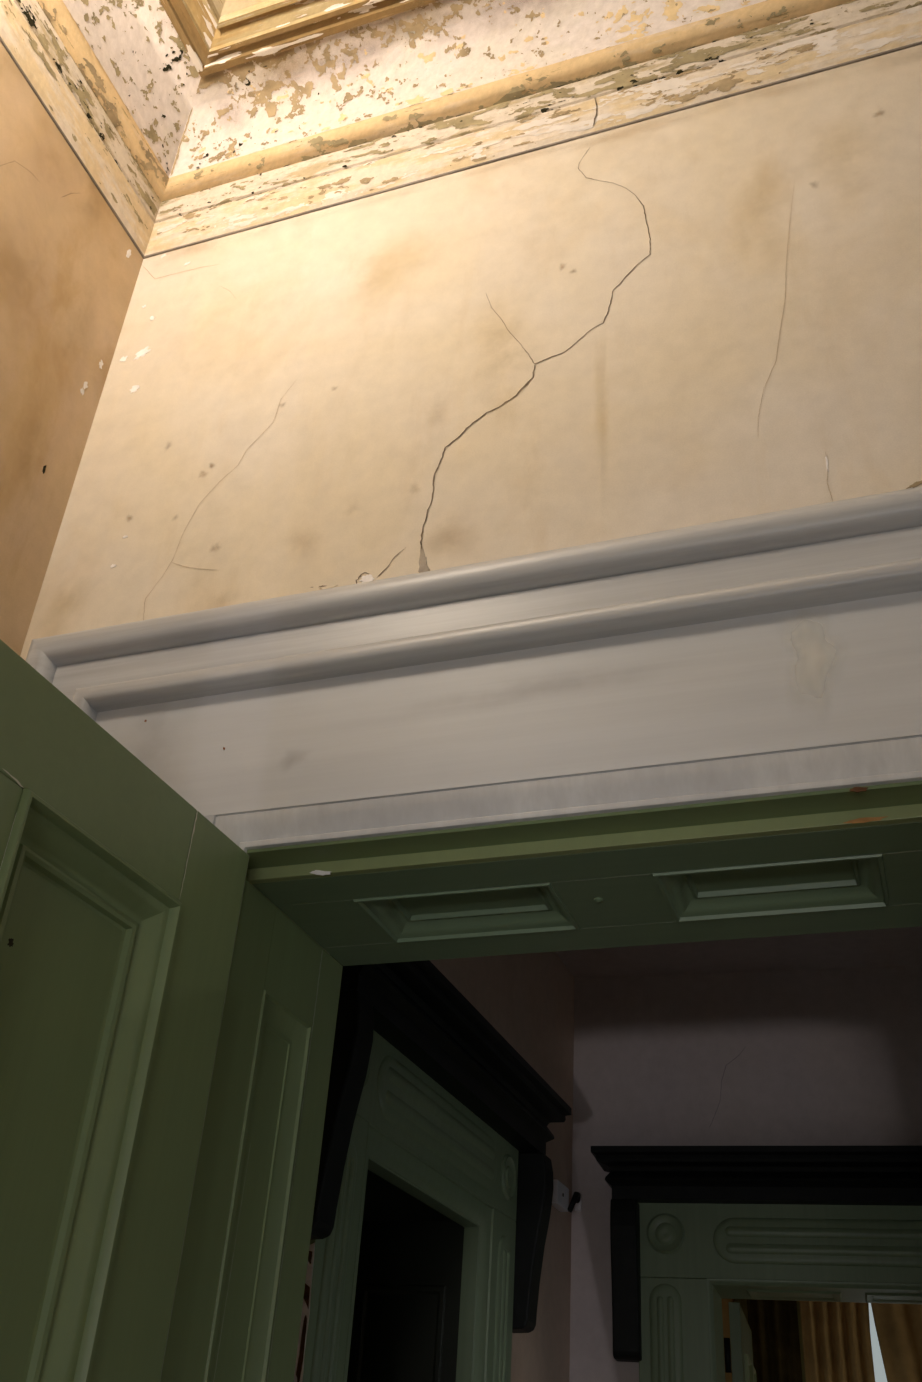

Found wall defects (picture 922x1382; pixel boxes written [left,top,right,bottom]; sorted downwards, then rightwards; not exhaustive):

peeling [4,0,922,259]
crack [310,99,651,589]